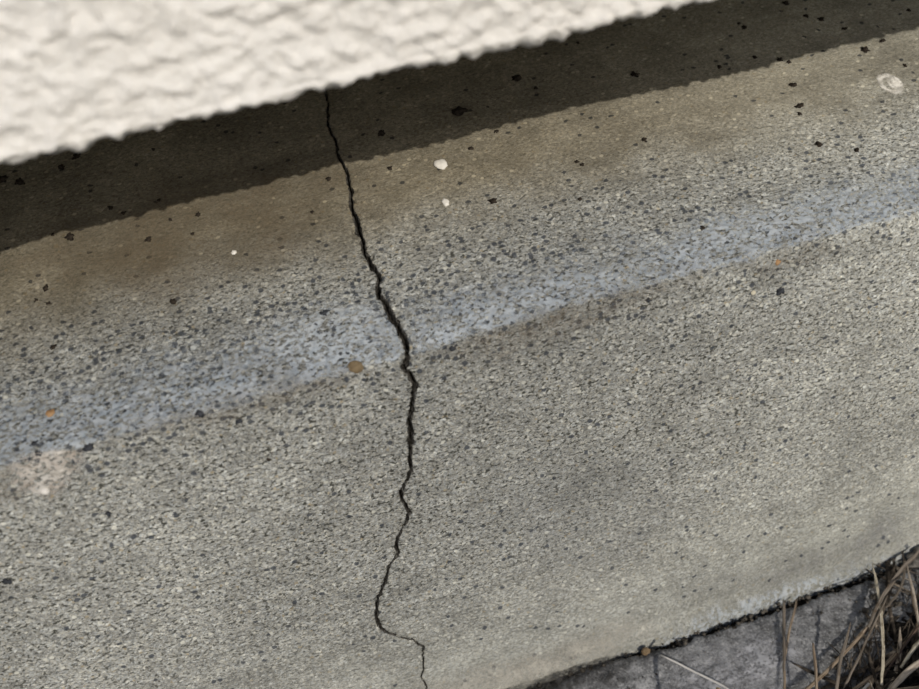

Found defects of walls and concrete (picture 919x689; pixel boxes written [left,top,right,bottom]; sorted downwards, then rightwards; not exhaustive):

crack [325,89,427,688]
crack [618,566,901,660]
crack [525,673,575,689]